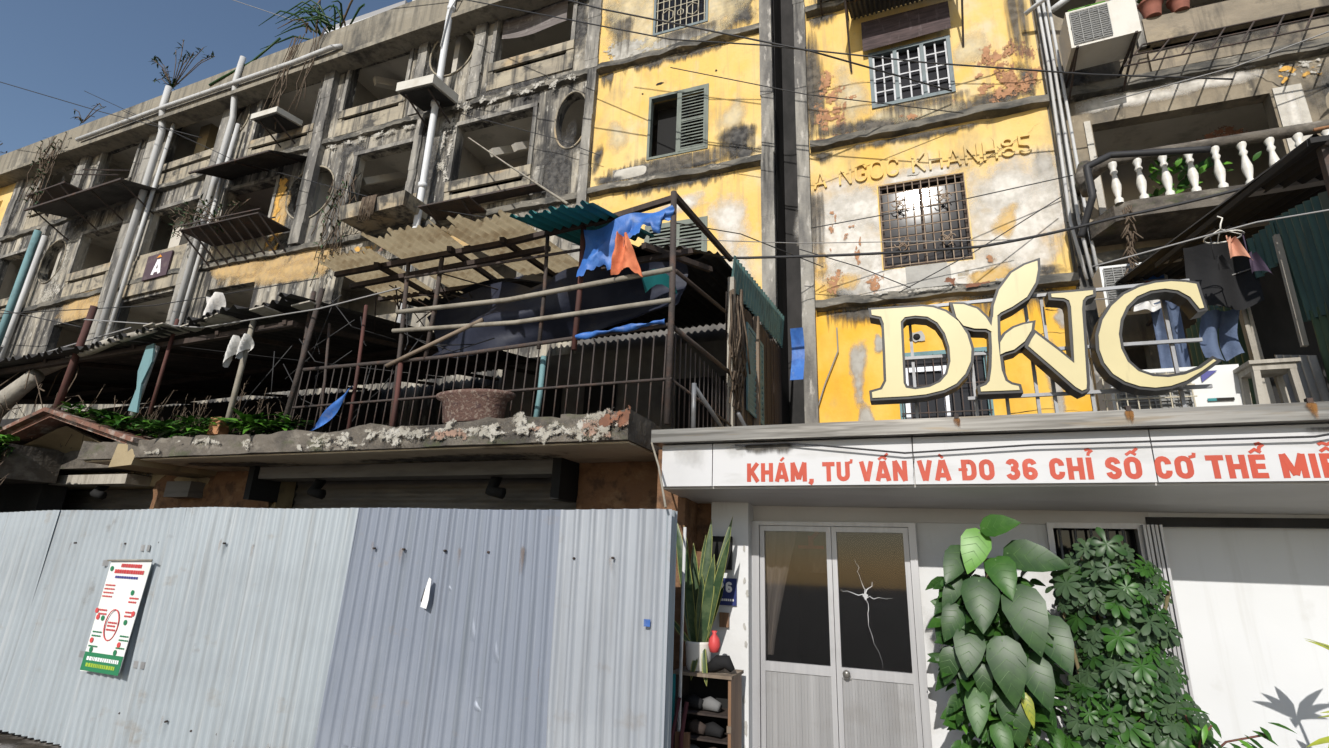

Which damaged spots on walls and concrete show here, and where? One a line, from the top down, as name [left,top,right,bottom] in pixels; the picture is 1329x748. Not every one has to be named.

damp [634,0,752,70]
peeling [953,35,1042,103]
peeling [813,70,956,140]
damp [593,124,755,197]
peeling [297,406,631,450]